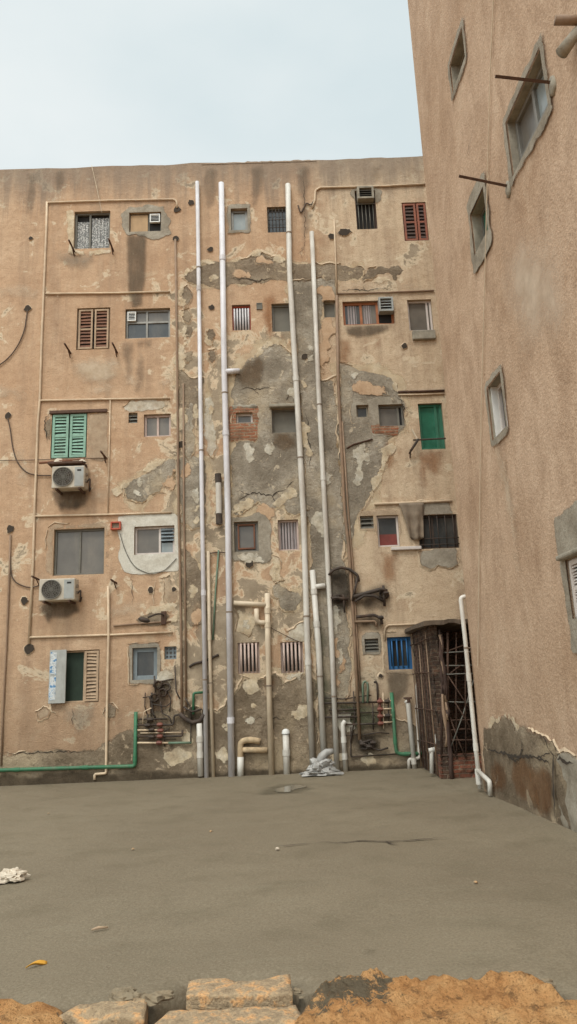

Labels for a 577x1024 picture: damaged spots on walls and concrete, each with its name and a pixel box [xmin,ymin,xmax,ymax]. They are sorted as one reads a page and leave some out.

damp [128,235,145,305]
damp [241,359,262,384]
crack [241,387,313,501]
spalling [0,247,423,785]
crack [485,737,573,819]
spalling [483,714,577,833]